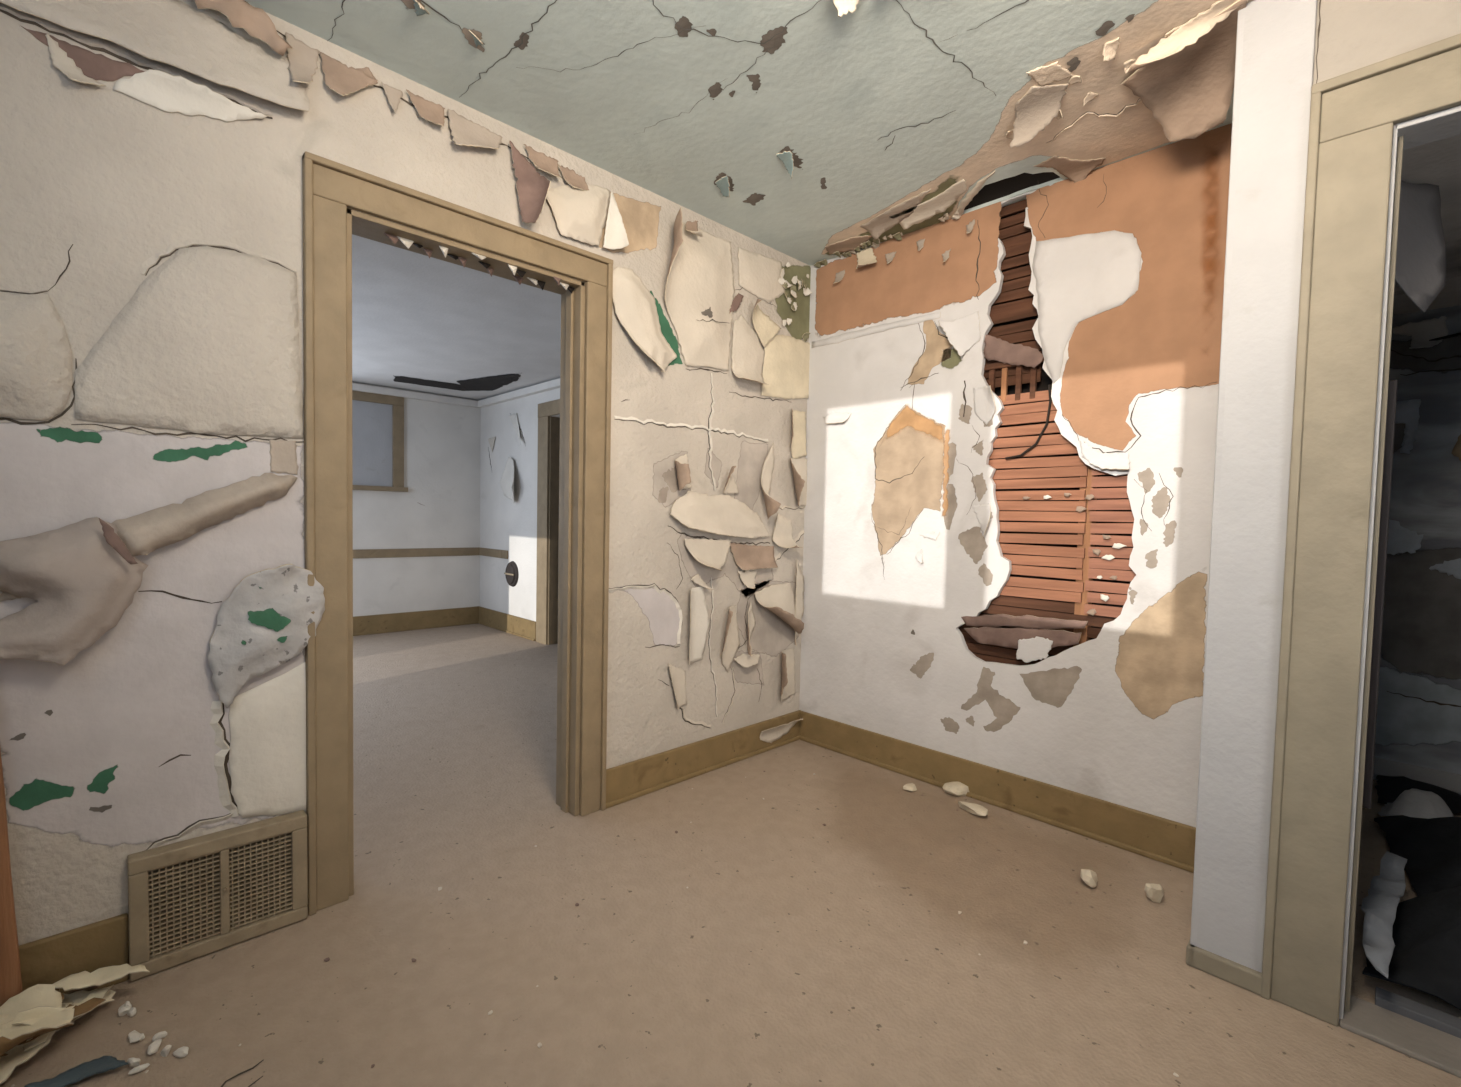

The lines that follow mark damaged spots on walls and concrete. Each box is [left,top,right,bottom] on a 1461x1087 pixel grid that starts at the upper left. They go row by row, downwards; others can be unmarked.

crack [401,0,821,132]
peeling [194,0,1253,734]
peeling [1393,399,1421,455]
peeling [1389,180,1461,376]
crack [0,592,21,602]
peeling [0,239,325,846]
peeling [759,718,803,743]
peeling [1375,519,1461,746]